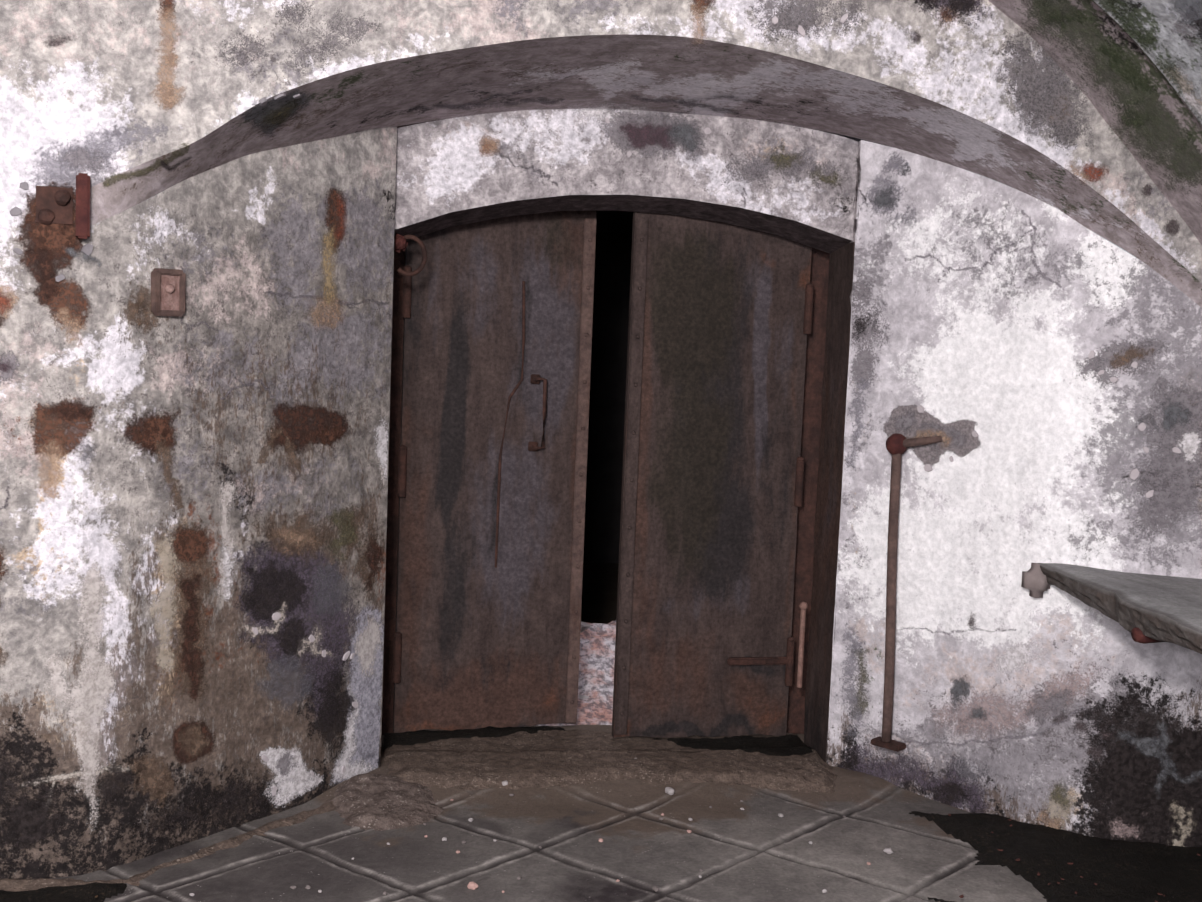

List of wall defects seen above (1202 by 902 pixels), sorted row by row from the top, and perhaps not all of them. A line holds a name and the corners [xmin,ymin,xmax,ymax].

corrosion [39,275,92,345]
corrosion [312,188,347,327]
corrosion [30,398,95,498]
corrosion [257,402,348,479]
corrosion [124,411,217,700]
damp [0,564,278,869]
corrosion [171,718,215,766]
damp [1038,687,1202,847]